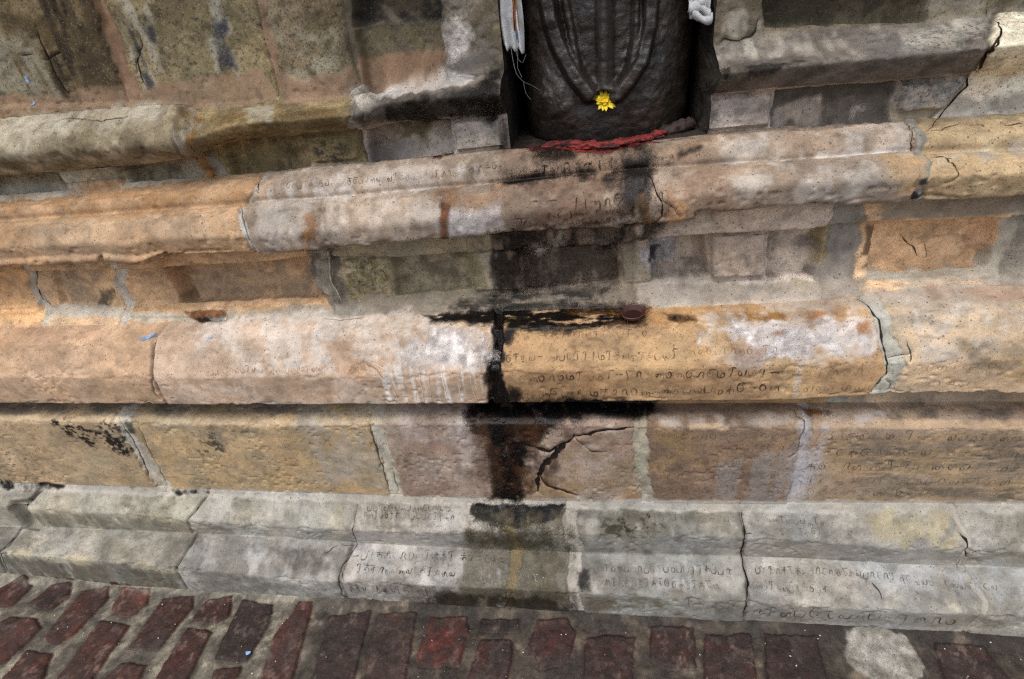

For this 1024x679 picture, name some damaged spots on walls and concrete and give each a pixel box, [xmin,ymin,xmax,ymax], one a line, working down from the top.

water stain [480,64,504,125]
crack [906,9,1003,183]
water stain [503,167,595,184]
water stain [562,140,671,214]
water stain [449,246,639,345]
crack [857,299,912,392]
water stain [507,387,522,401]
water stain [51,419,134,457]
crack [529,427,633,495]
water stain [602,518,648,534]
crack [741,512,751,615]